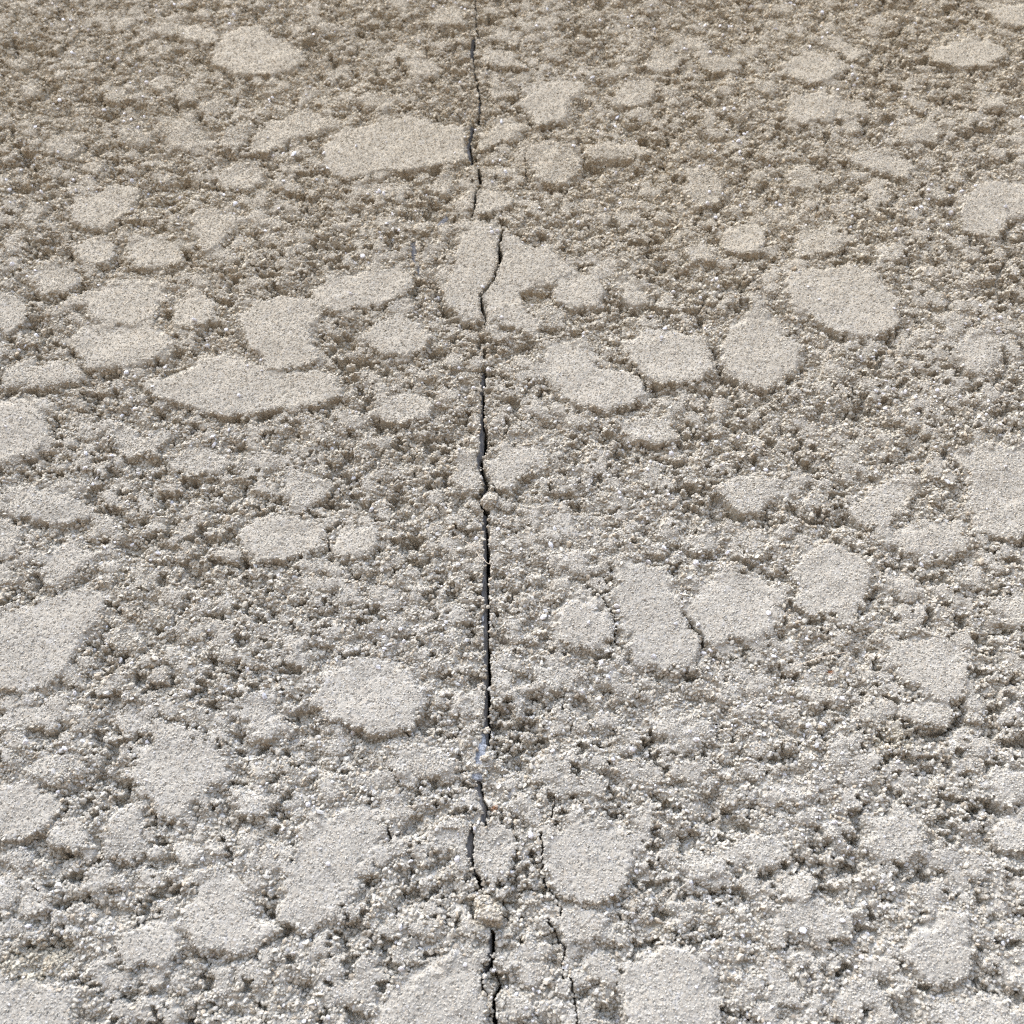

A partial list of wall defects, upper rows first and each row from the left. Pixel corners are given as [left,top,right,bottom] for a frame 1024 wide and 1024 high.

crack [466,0,481,165]
crack [476,374,495,746]
crack [466,781,491,894]
crack [481,930,502,1024]